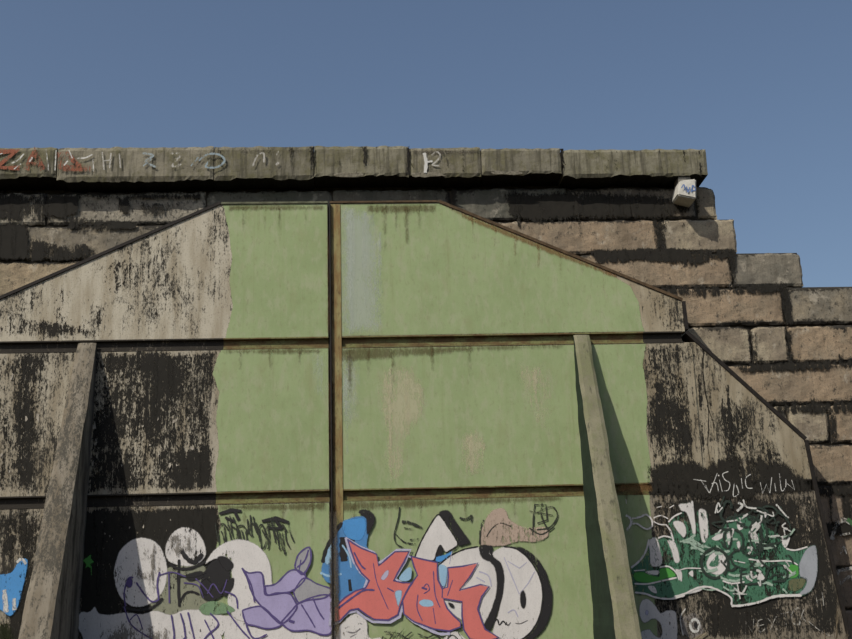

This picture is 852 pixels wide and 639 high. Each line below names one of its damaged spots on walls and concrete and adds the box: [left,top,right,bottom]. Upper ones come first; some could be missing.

damp [504,190,852,373]
damp [0,512,42,639]